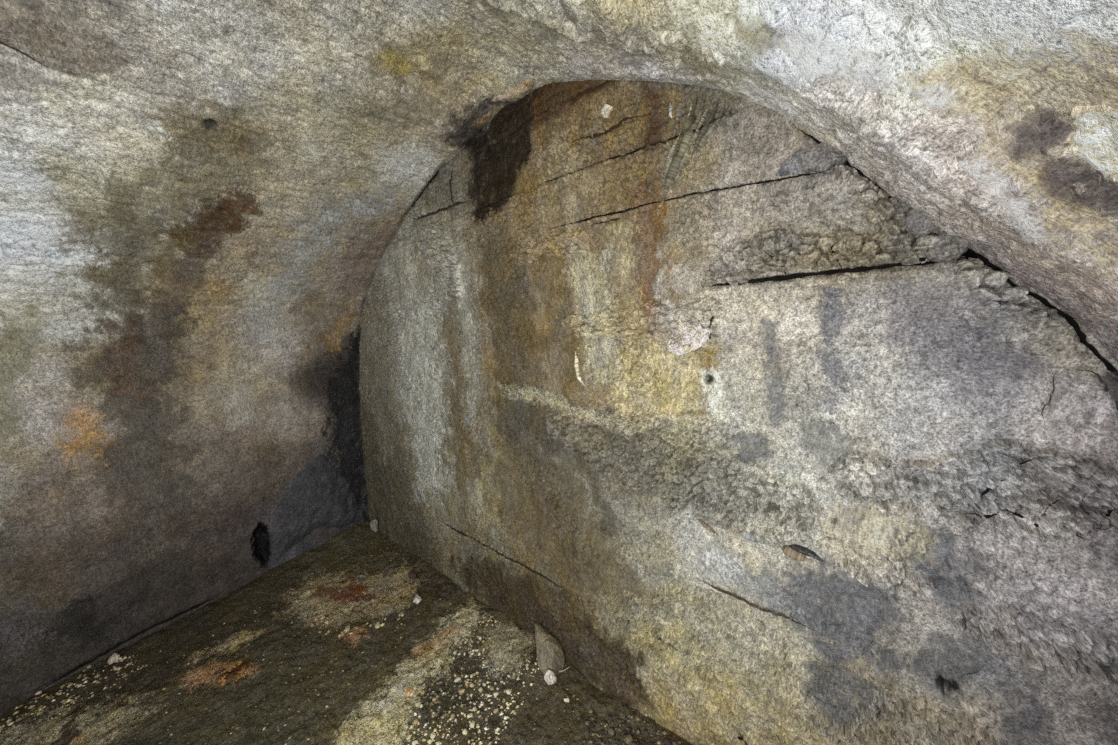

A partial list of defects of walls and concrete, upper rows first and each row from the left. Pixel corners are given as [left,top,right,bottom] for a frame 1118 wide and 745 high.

damp [0,306,45,439]
damp [56,99,287,566]
damp [465,79,602,224]
crack [511,81,610,132]
rust [467,80,720,435]
crack [539,115,723,185]
crack [550,161,892,229]
crack [702,225,1118,422]
damp [246,185,664,745]
damp [746,488,780,512]
crack [939,457,1062,527]
crack [1076,509,1116,541]